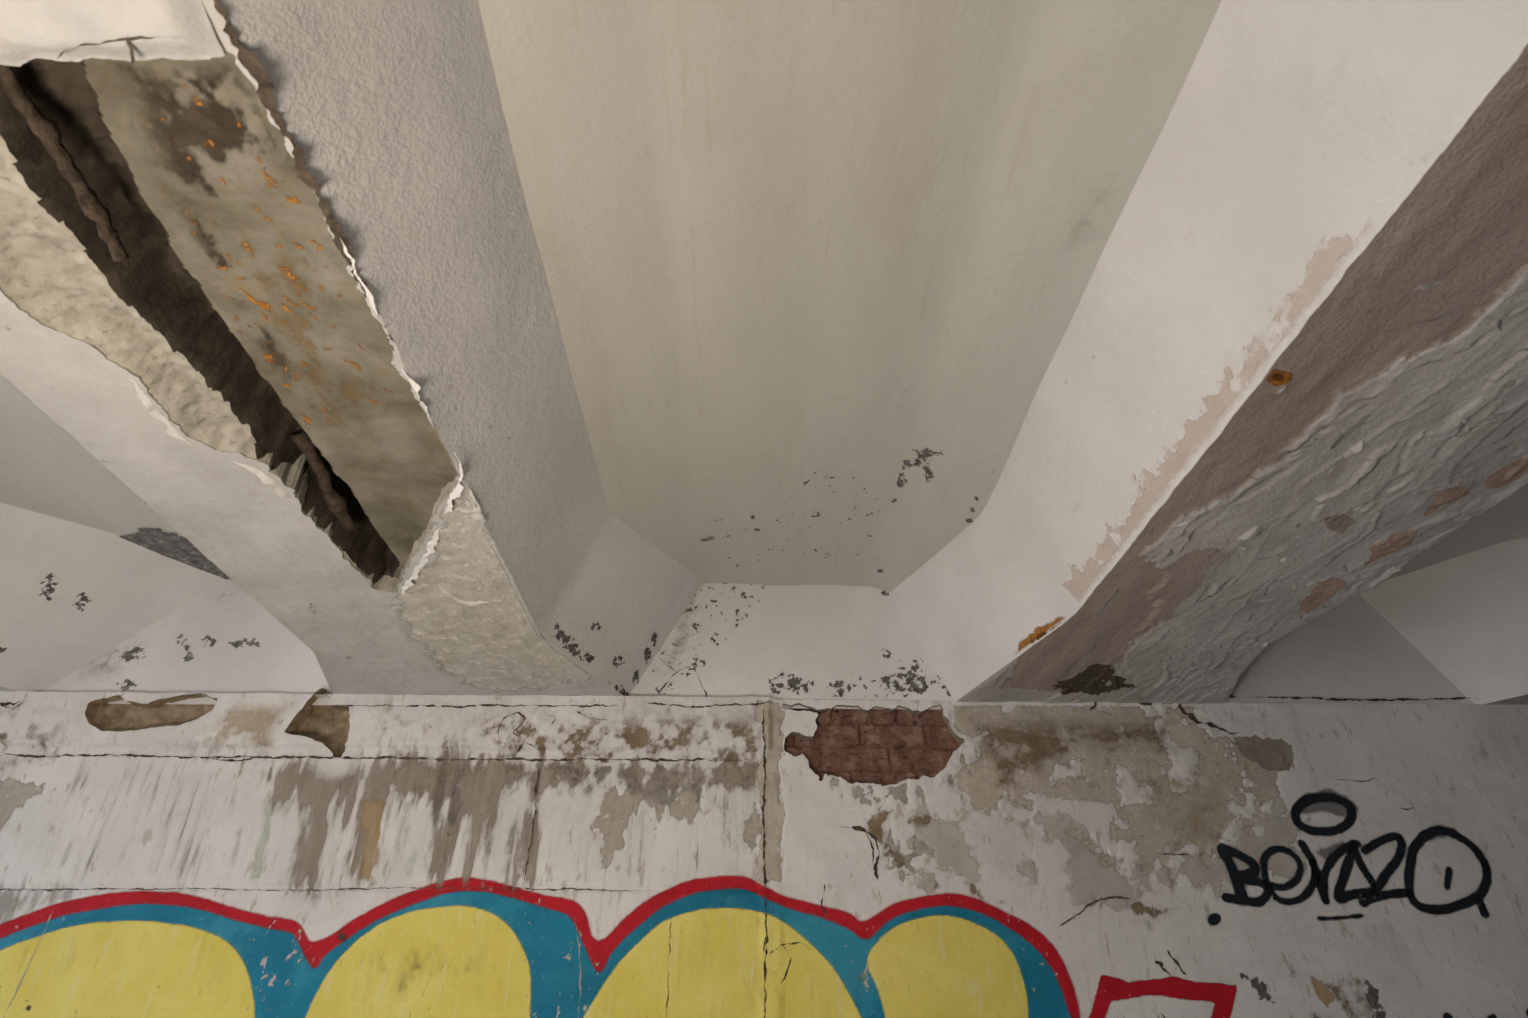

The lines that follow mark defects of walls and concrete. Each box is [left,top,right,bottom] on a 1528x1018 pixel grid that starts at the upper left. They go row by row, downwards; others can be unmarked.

spalling [0,38,592,692]
corrosion [1267,369,1292,386]
peeling [726,46,1528,911]
corrosion [1018,617,1062,651]
hole [85,693,217,731]
flaking render [285,688,350,758]
peeling [538,761,716,868]